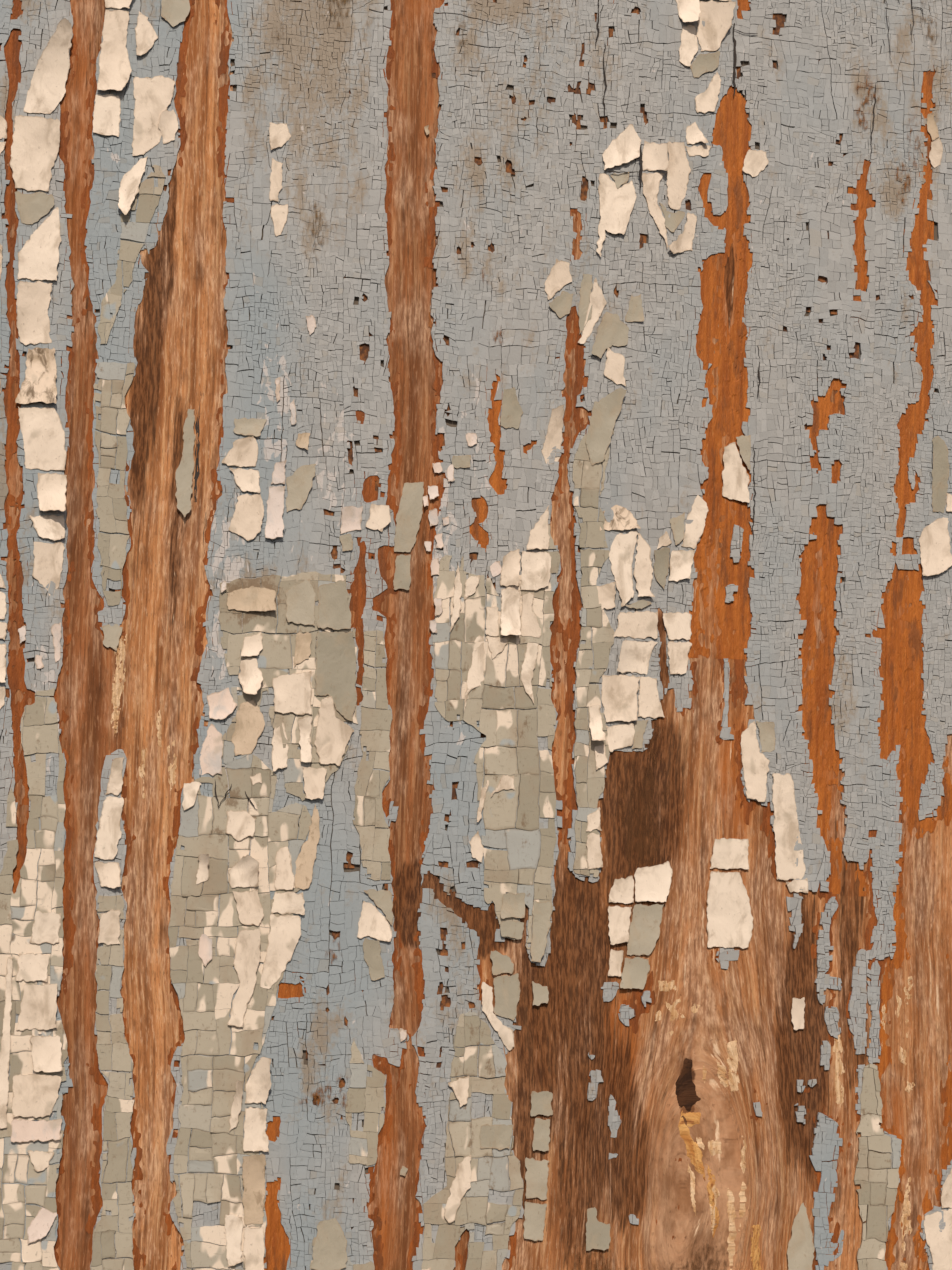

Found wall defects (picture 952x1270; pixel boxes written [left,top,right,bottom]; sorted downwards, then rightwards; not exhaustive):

peeling [135,12,158,56]
crack [595,0,607,125]
peeling [675,0,751,78]
crack [733,23,758,96]
crack [870,0,924,159]
crack [604,145,643,190]
peeling [570,208,588,261]
peeling [545,259,572,300]
peeling [359,332,375,366]
peeling [804,378,847,485]
crack [194,391,208,574]
crack [750,449,758,540]